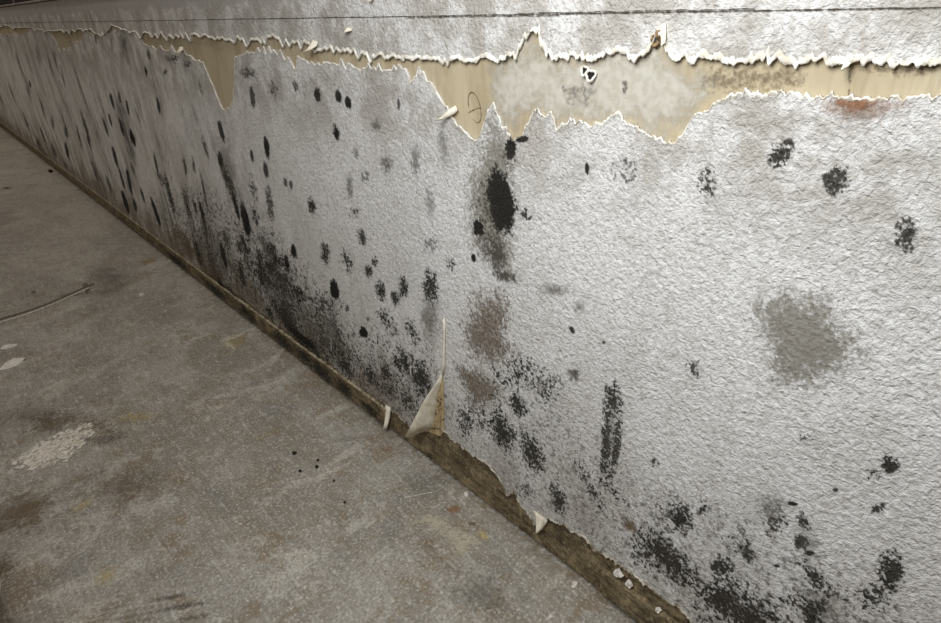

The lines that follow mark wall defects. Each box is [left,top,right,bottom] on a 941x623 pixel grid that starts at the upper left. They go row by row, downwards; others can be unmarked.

damp [37,105,91,166]
peeling [0,24,941,146]
damp [767,138,794,168]
damp [822,164,851,196]
damp [102,42,742,472]
damp [894,216,917,253]
damp [753,289,867,390]
peeling [366,318,693,623]
damp [573,380,630,513]
damp [867,455,900,480]
damp [621,498,908,623]